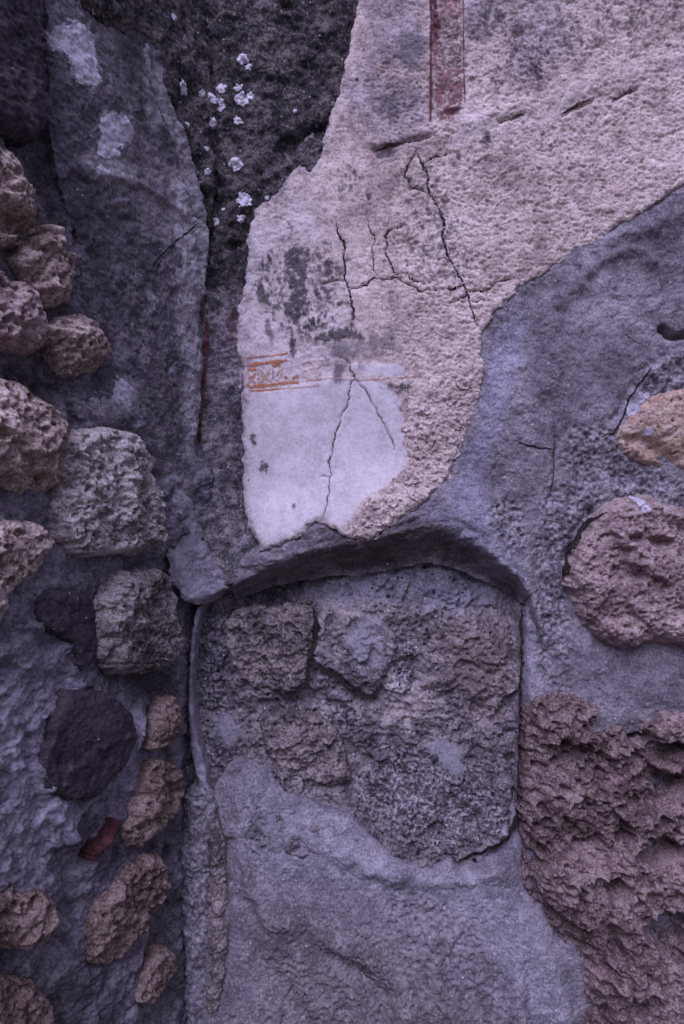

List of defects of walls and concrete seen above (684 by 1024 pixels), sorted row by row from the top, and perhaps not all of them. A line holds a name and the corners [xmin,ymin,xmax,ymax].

crack [323,137,510,326]
crack [322,357,395,520]
crack [599,331,651,437]